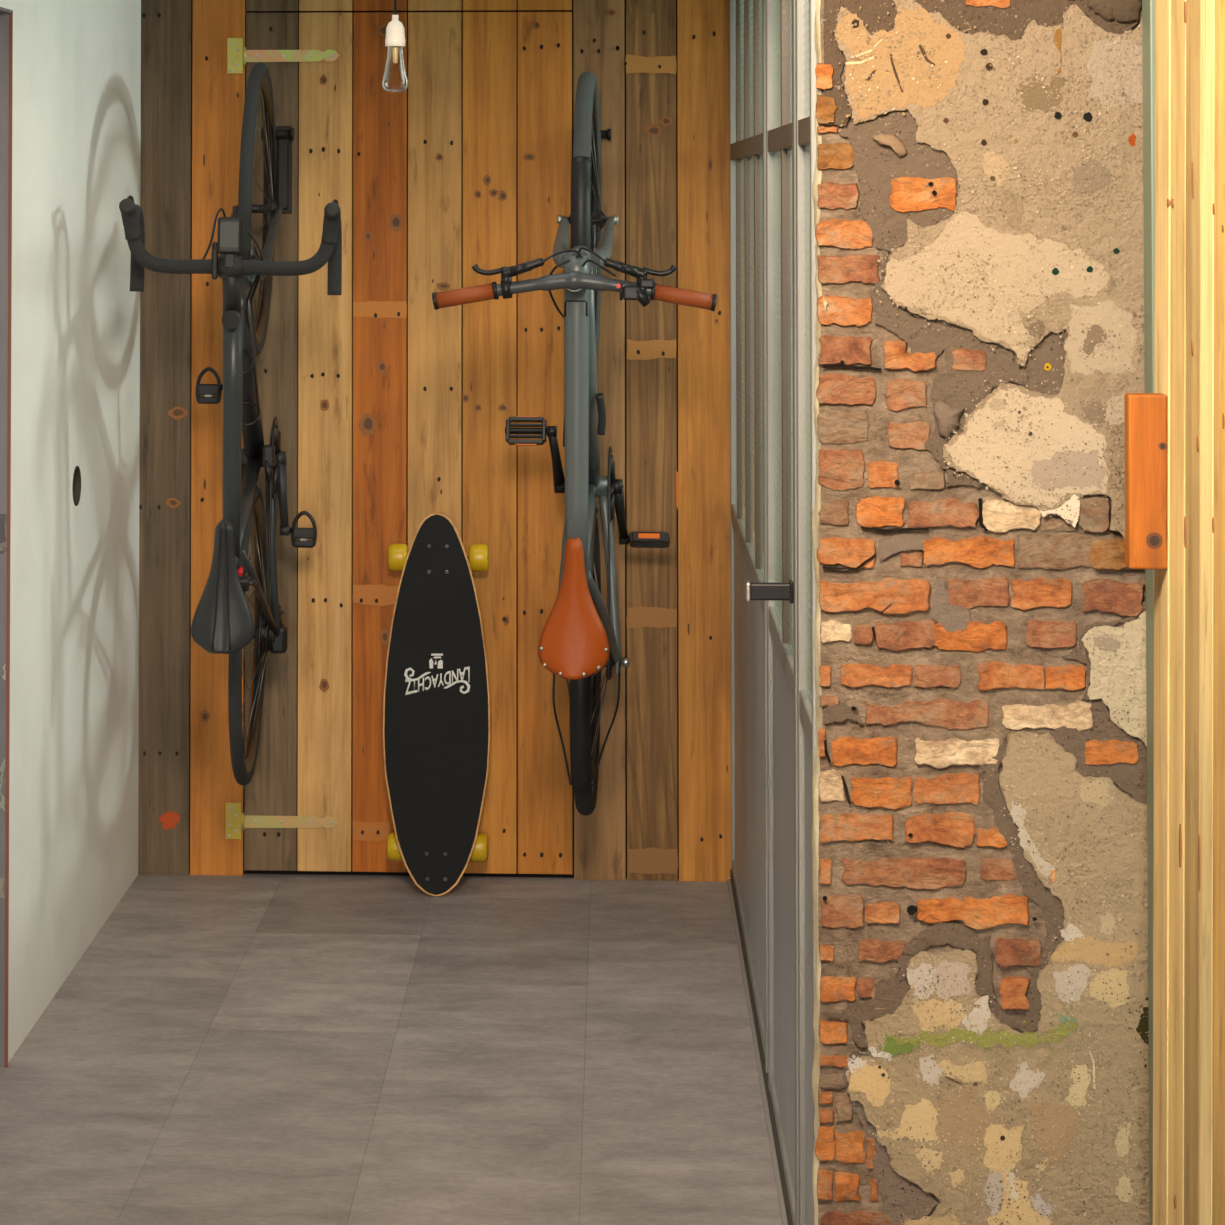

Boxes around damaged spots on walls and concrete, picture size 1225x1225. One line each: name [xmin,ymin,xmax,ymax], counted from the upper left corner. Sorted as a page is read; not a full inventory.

flaking render [823,0,1145,540]
spalling [877,533,930,561]
flaking render [829,574,1150,1225]